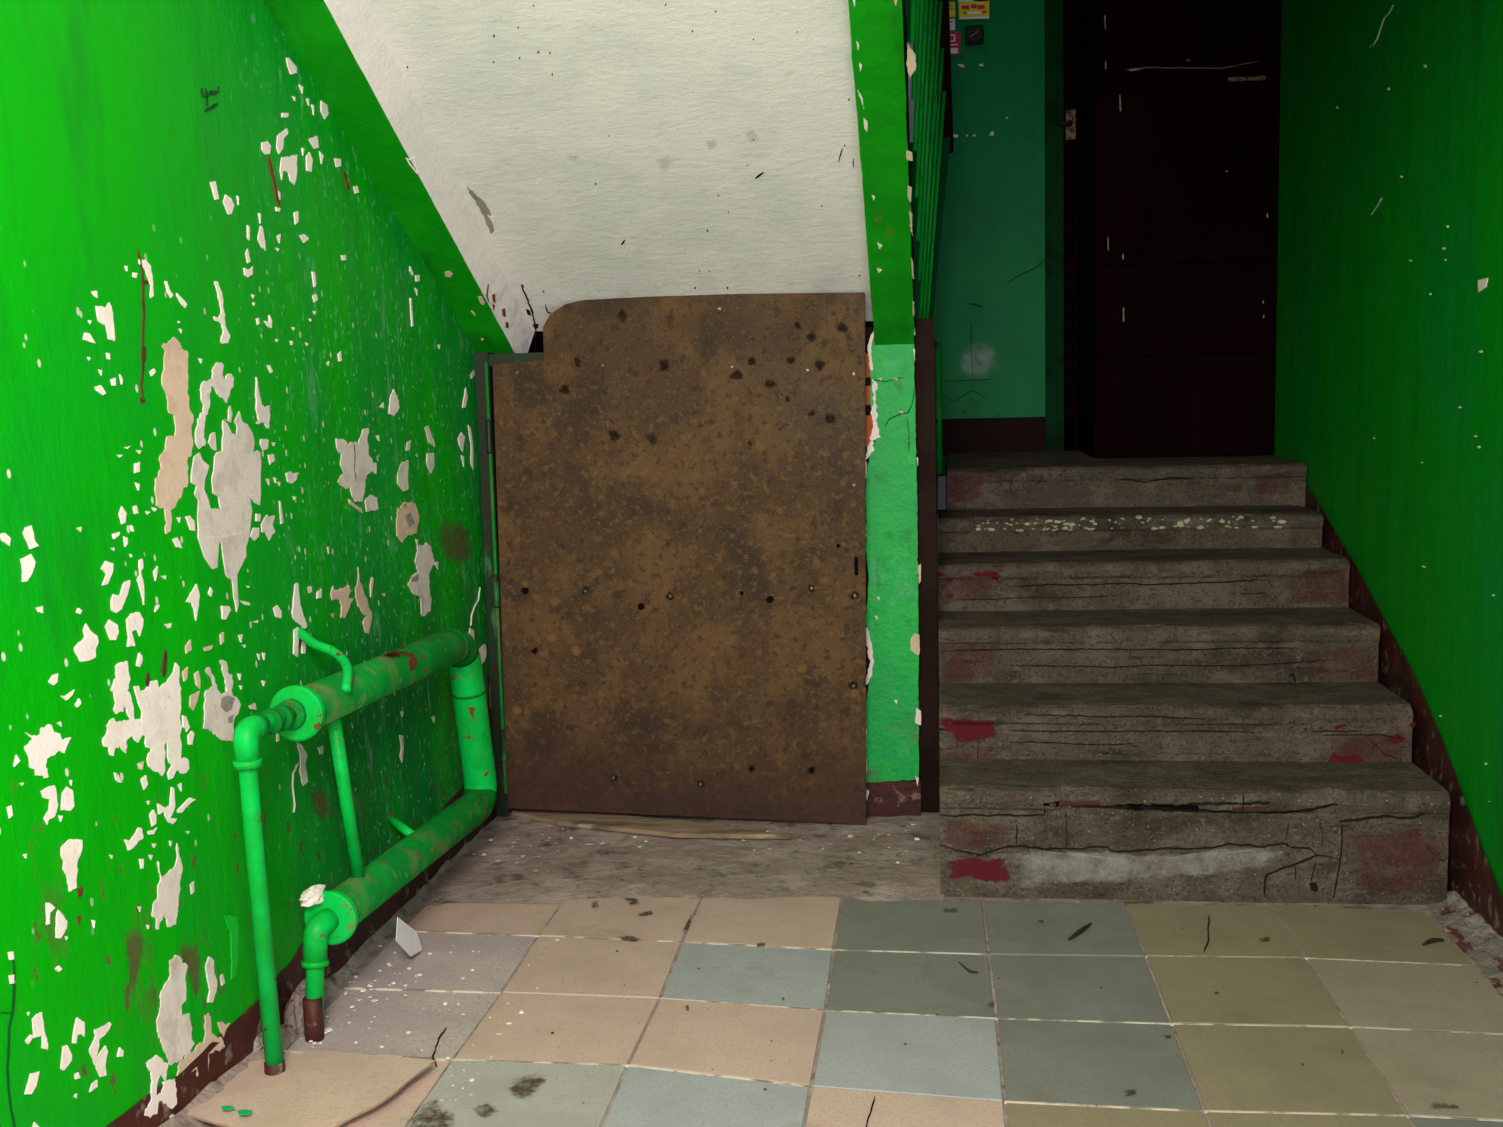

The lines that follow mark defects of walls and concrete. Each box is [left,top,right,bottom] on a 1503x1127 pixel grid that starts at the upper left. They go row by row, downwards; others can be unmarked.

peeling [210,181,239,214]
peeling [243,58,341,346]
rust [730,358,755,379]
peeling [0,526,39,582]
peeling [74,259,385,929]
peeling [396,426,438,617]
peeling [13,722,74,825]
peeling [60,839,83,897]
crack [938,794,1443,897]
peeling [45,902,95,940]
peeling [24,1012,124,1098]
peeling [144,955,230,1118]